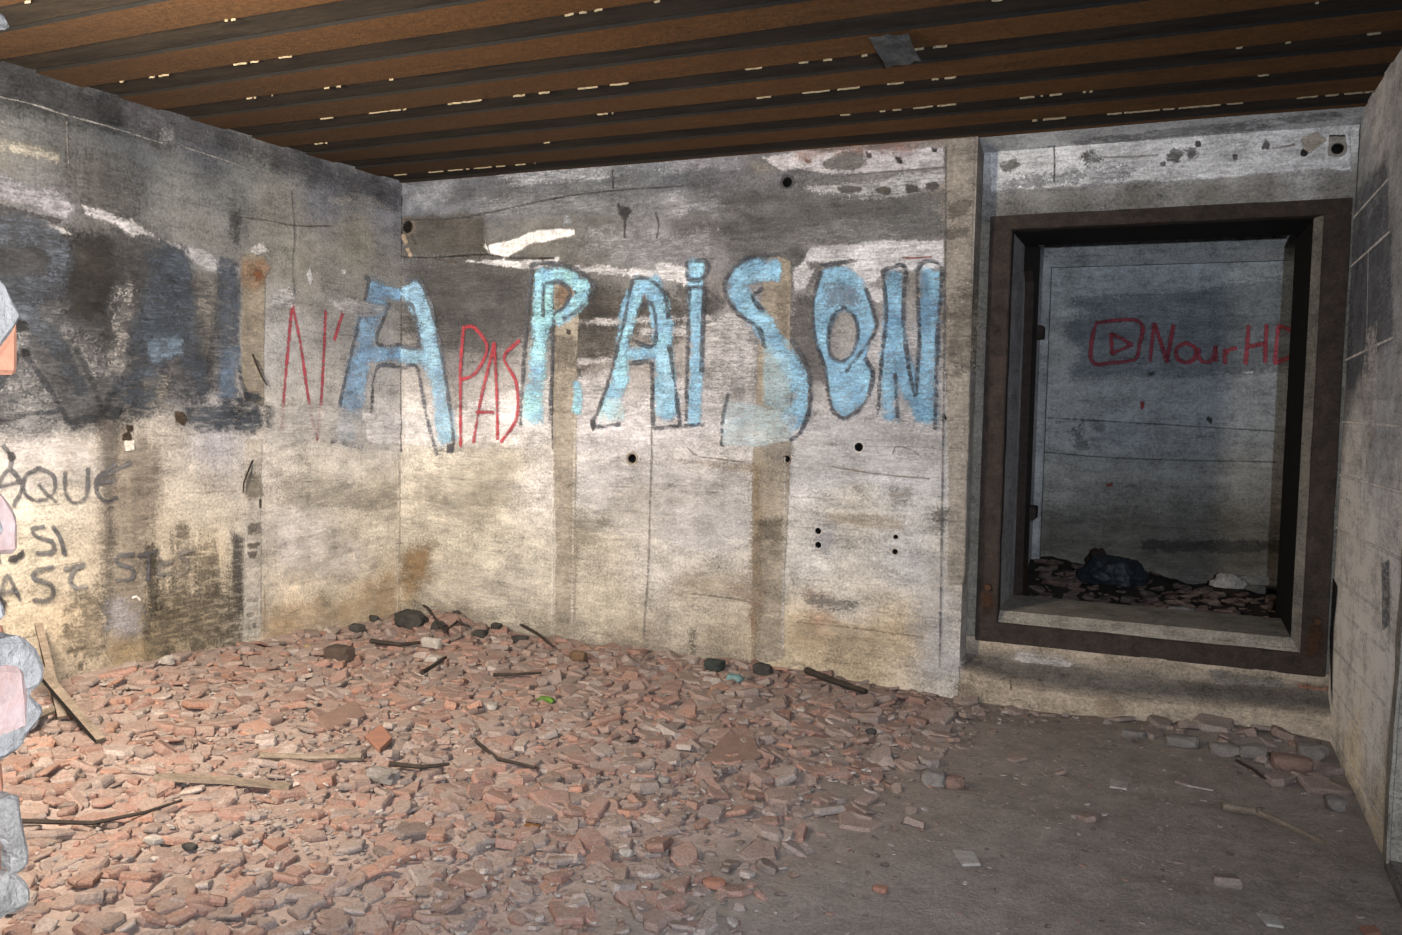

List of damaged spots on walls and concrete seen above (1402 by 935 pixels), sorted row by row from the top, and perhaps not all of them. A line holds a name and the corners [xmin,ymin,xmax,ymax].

damp [58,422,245,670]
damp [262,574,728,658]